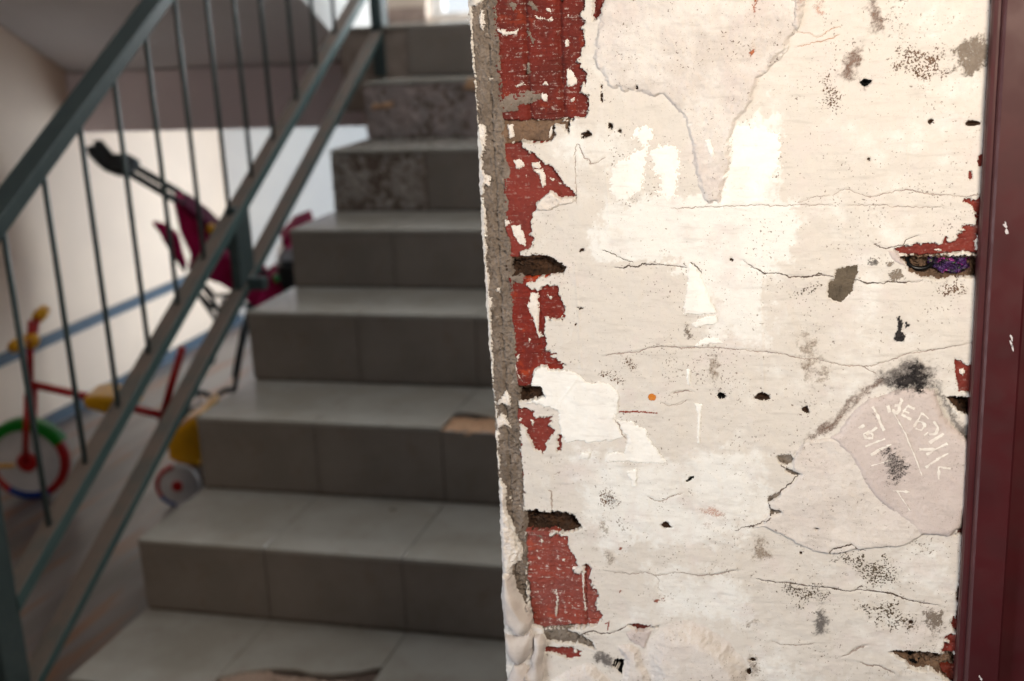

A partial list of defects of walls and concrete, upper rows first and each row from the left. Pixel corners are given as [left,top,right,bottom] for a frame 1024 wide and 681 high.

peeling [608,123,682,203]
peeling [717,122,783,208]
crack [675,189,980,209]
spalling [894,197,980,255]
crack [603,250,702,273]
crack [744,261,922,284]
spalling [442,0,666,658]
crack [606,342,972,374]
crack [735,454,799,531]
crack [605,570,938,605]
spalling [219,670,326,681]
crack [843,645,894,673]